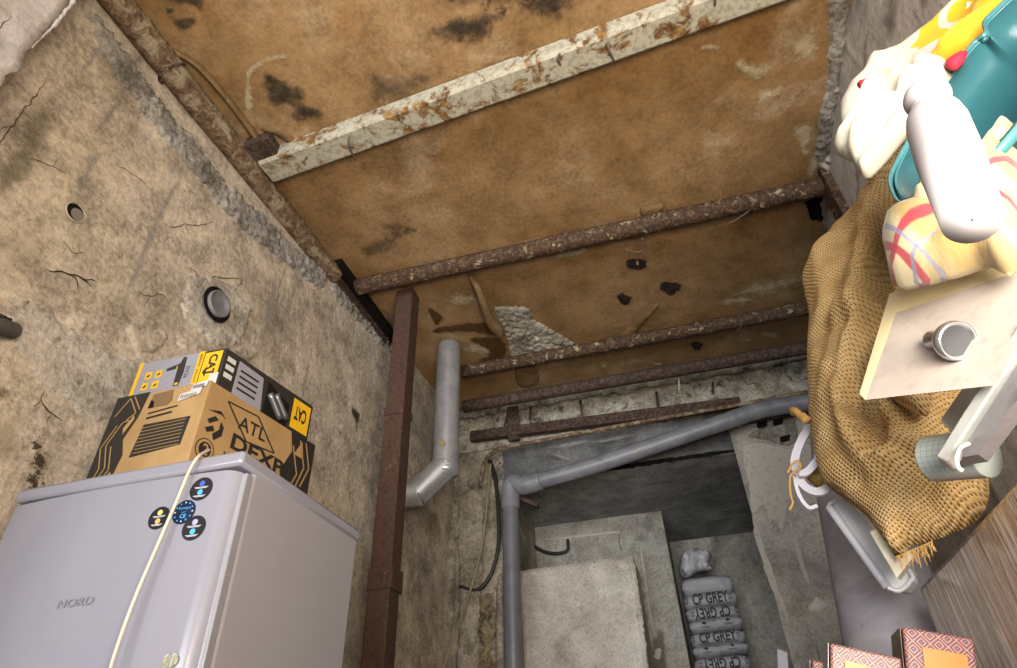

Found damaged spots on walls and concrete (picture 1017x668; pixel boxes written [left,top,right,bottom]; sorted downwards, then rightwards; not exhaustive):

mould [166,0,202,29]
damp [436,10,505,42]
damp [524,0,564,18]
damp [245,54,286,110]
damp [264,75,322,120]
spalling [467,274,574,356]
spalling [459,355,807,427]